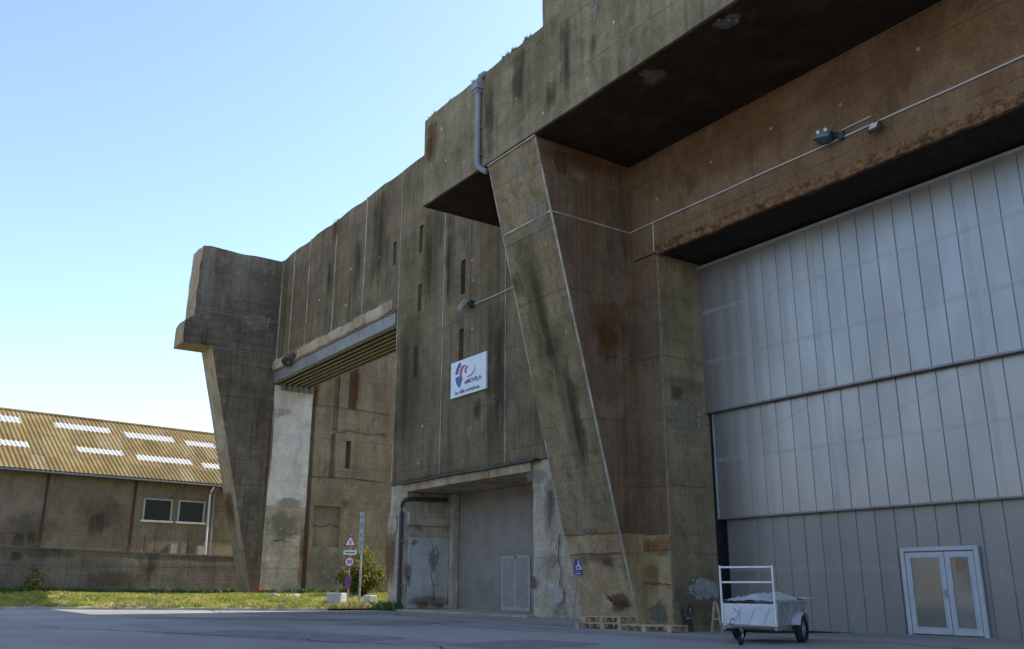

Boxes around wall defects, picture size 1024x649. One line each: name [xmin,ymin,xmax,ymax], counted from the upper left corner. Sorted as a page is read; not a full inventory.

corrosion [655,91,1024,255]
crack [105,521,673,649]